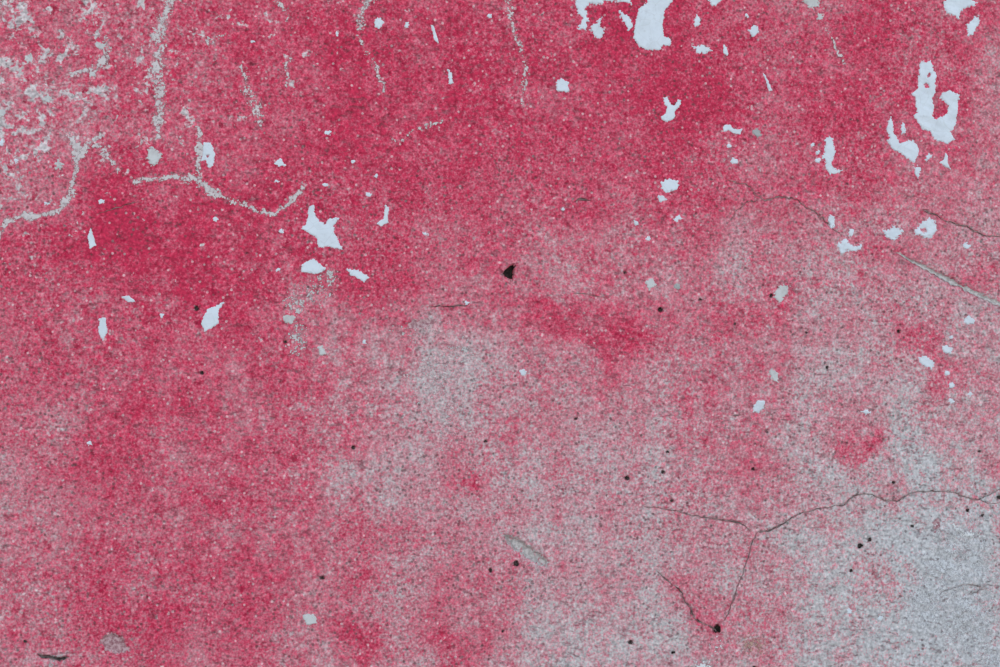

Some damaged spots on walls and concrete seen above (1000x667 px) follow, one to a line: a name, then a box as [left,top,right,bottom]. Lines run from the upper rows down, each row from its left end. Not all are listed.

peeling [575,0,673,51]
peeling [691,44,728,56]
peeling [886,60,960,179]
peeling [815,136,843,175]
peeling [301,205,342,250]
crack [728,180,837,232]
crack [925,210,1000,237]
peeling [201,302,224,332]
peeling [283,259,369,356]
crack [644,489,1000,631]